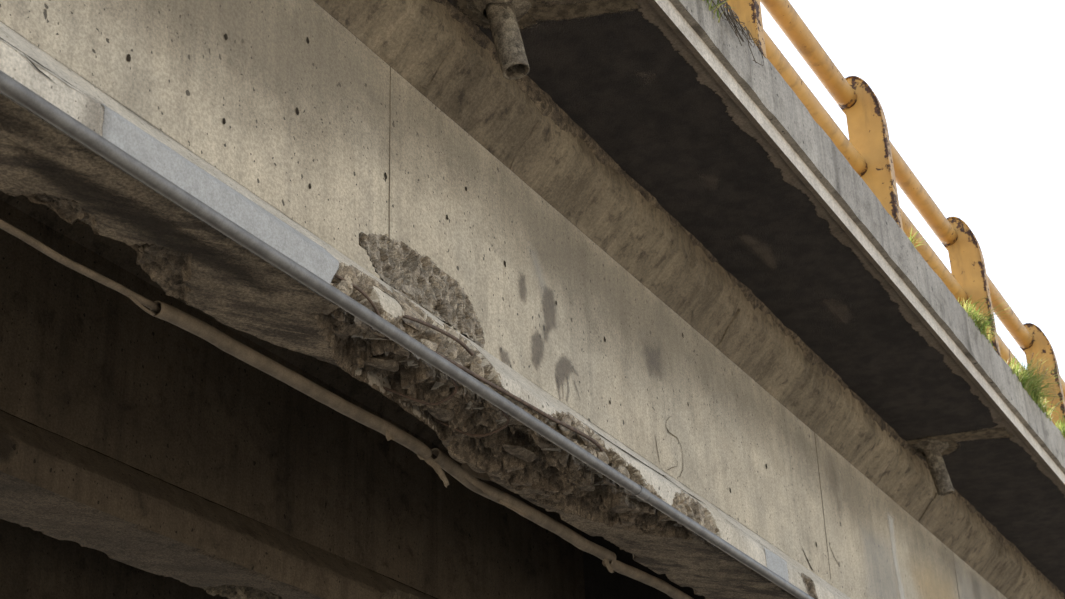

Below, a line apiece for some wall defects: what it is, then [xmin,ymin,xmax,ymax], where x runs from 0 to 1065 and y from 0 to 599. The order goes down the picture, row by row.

crack [0,22,289,217]
spalling [119,241,195,305]
spalling [310,232,719,547]
leakage [518,0,1065,594]
spalling [801,573,818,599]